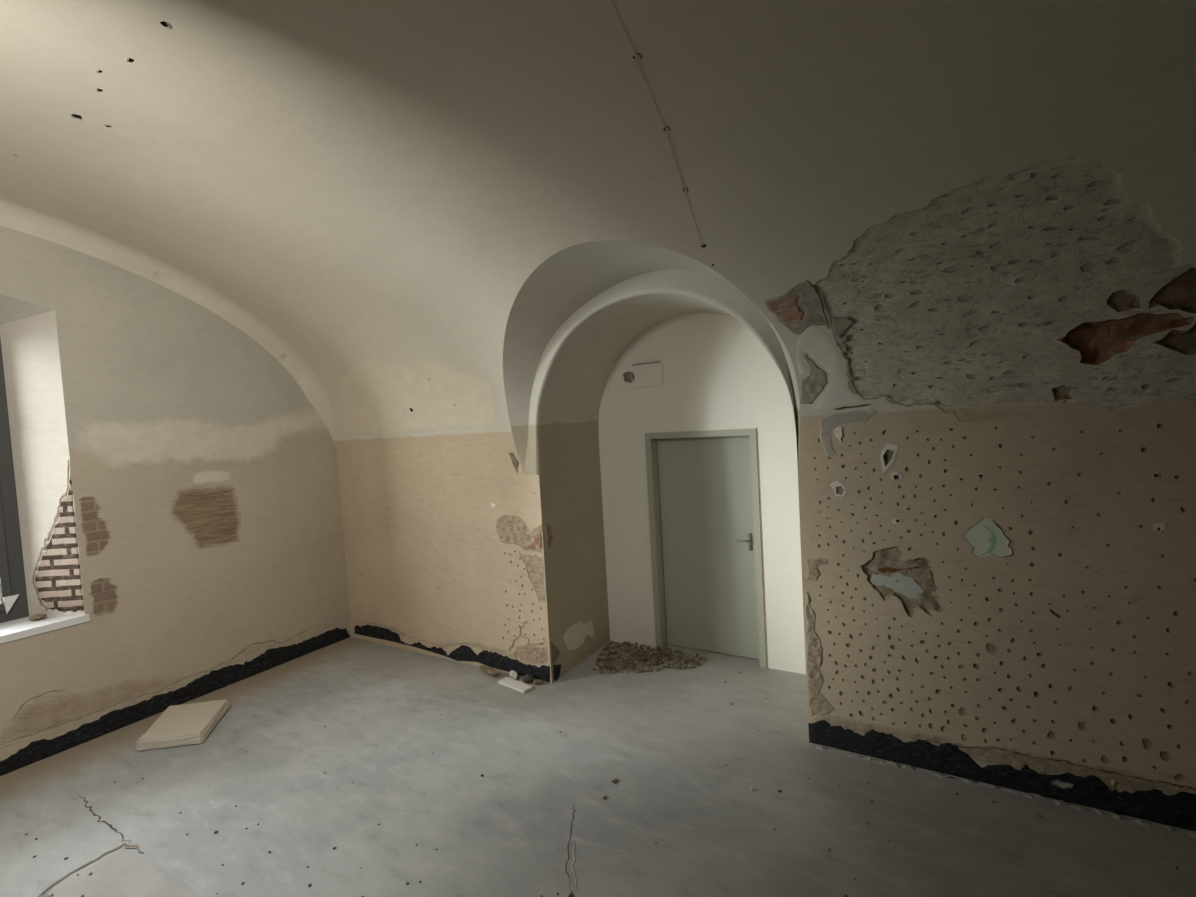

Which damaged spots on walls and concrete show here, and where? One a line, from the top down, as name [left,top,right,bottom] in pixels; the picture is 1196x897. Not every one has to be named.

crack [611,0,703,244]
spalling [800,353,827,404]
flaking render [31,460,119,619]
flaking render [170,485,241,550]
spalling [358,513,559,664]
spalling [805,428,1196,795]
spalling [0,620,342,749]
crack [78,795,130,843]
crack [565,806,577,889]